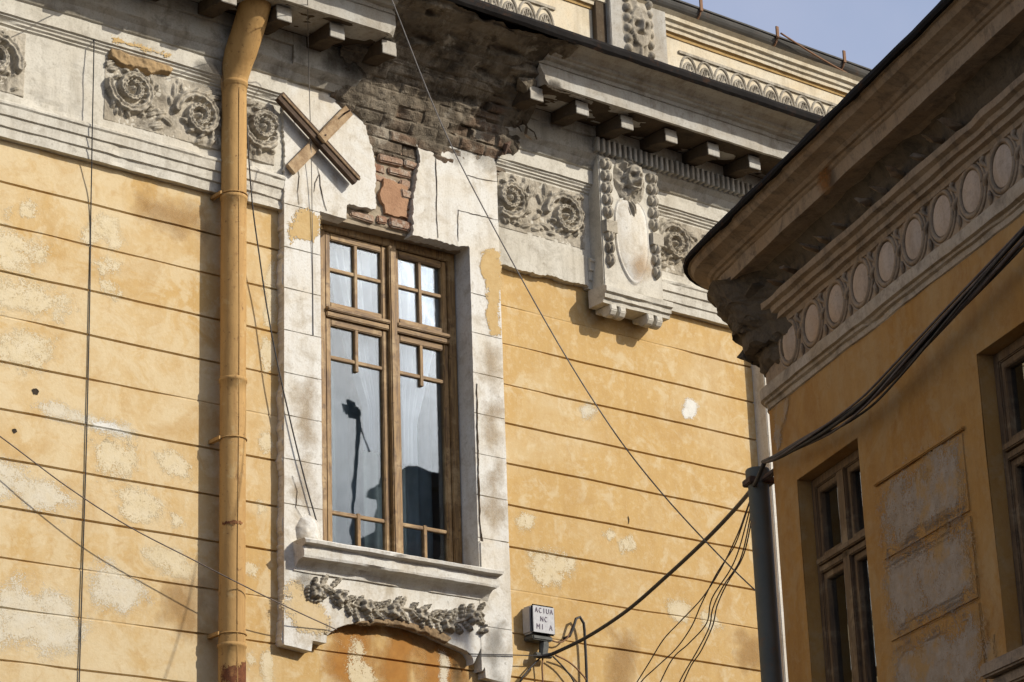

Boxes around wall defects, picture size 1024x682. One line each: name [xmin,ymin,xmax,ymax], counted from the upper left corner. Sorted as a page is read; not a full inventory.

spalling [330,0,578,234]
spalling [707,265,797,378]
peeling [87,437,193,530]
peeling [140,544,194,580]
peeling [514,511,536,533]
peeling [524,544,577,590]
peeling [602,528,637,555]
corrosion [219,662,246,682]